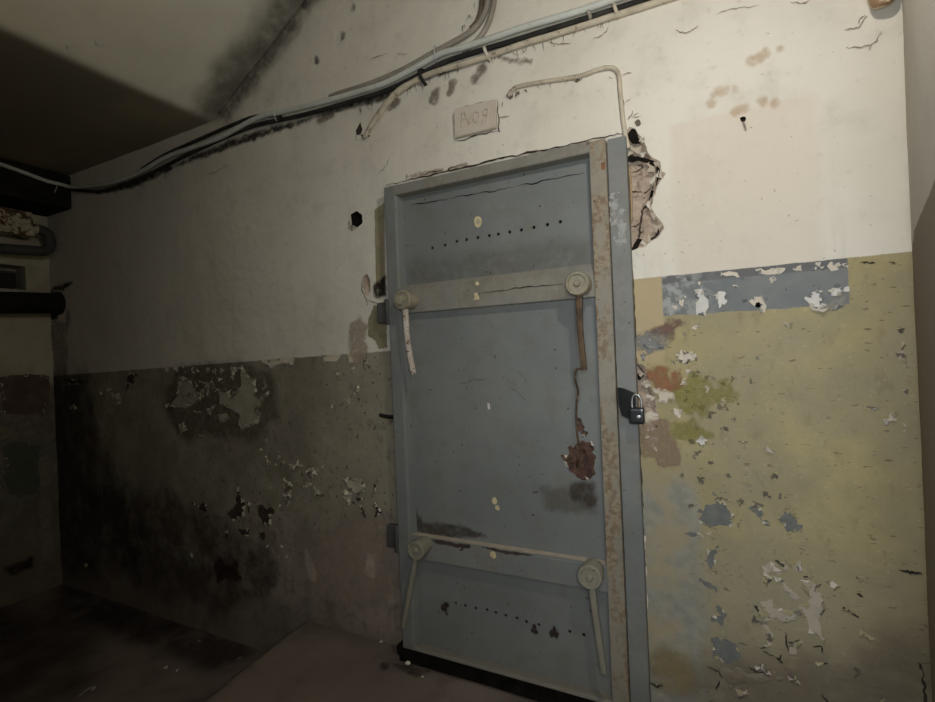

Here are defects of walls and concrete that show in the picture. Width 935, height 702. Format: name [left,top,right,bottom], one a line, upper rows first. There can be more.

mould [214,0,311,117]
crack [845,15,882,51]
peeling [672,271,740,330]
peeling [749,295,767,313]
peeling [755,262,849,284]
peeling [804,283,849,312]
peeling [164,365,269,431]
spalling [637,338,740,456]
corrosion [561,418,596,480]
peeling [224,435,325,558]
peeling [684,490,803,537]
peeling [752,557,841,654]